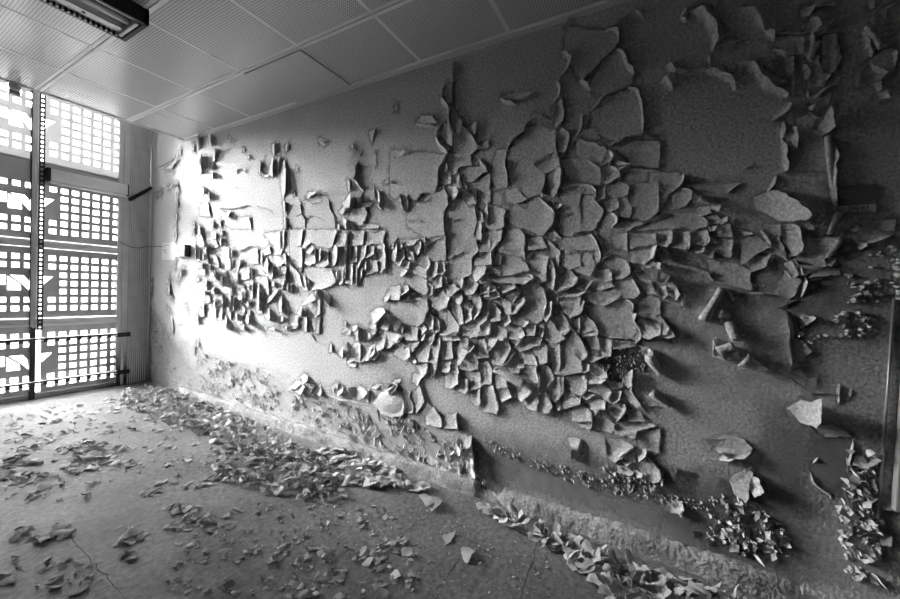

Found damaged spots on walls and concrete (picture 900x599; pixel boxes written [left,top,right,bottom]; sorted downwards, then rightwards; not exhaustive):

peeling [167,259,186,299]
peeling [185,0,900,588]